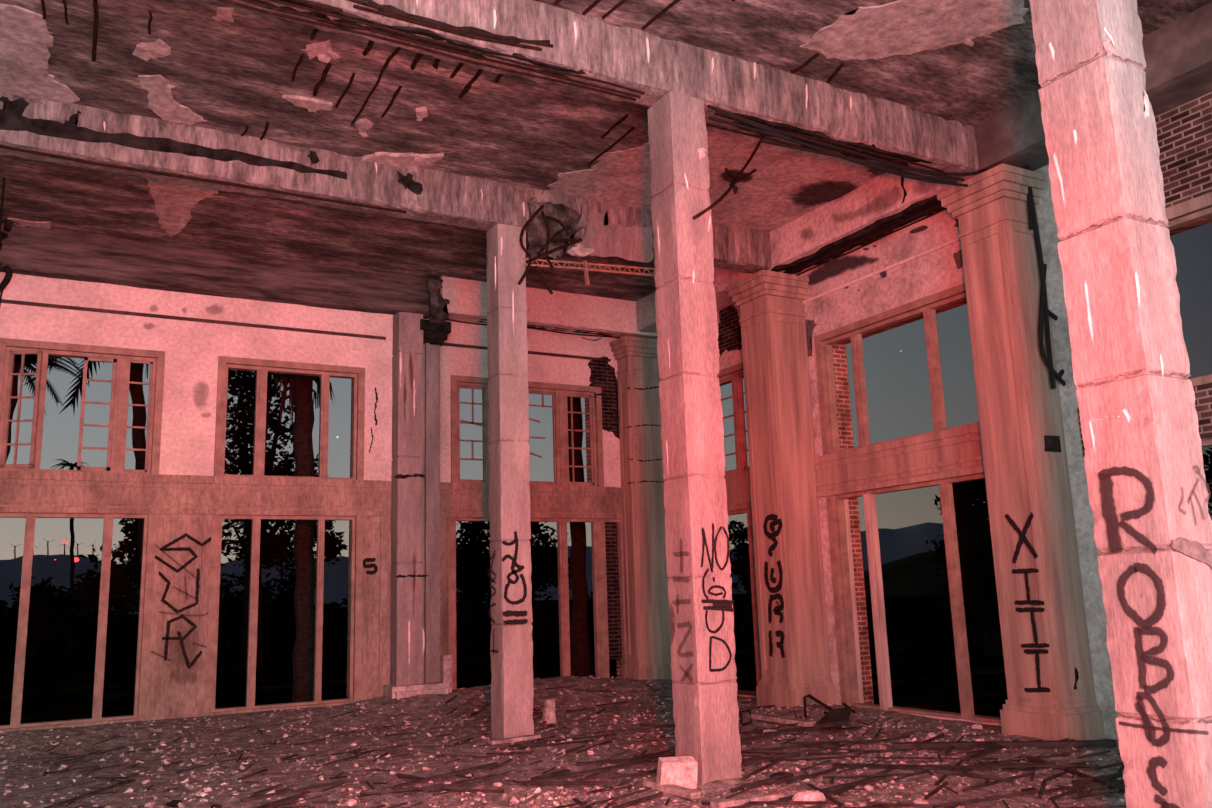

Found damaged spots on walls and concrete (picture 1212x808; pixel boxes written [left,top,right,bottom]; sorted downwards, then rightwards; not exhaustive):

spalling [642,0,680,30]
peeling [790,0,1029,83]
peeling [0,0,347,179]
peeling [0,145,406,237]
spalling [212,0,654,294]
peeling [697,112,944,231]
flaking render [588,356,620,439]